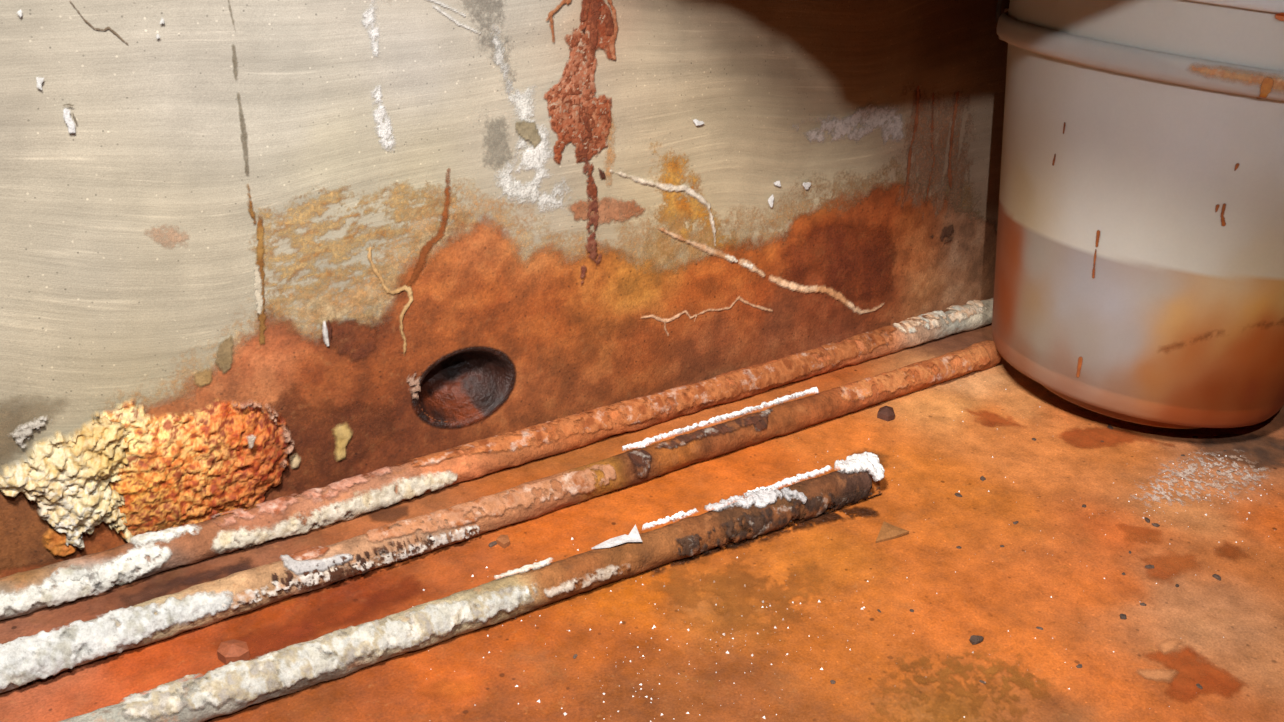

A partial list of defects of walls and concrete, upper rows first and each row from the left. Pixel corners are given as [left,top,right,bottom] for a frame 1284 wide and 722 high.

crack [229,5,266,344]
rust [112,0,997,502]
crack [610,170,884,336]
spalling [195,336,233,386]
spalling [323,320,332,346]
spalling [412,346,516,428]
rust [969,411,1018,426]
rust [1062,428,1152,448]
rust [0,521,128,578]
rust [126,560,254,606]
spalling [272,534,432,589]
rust [654,507,878,573]